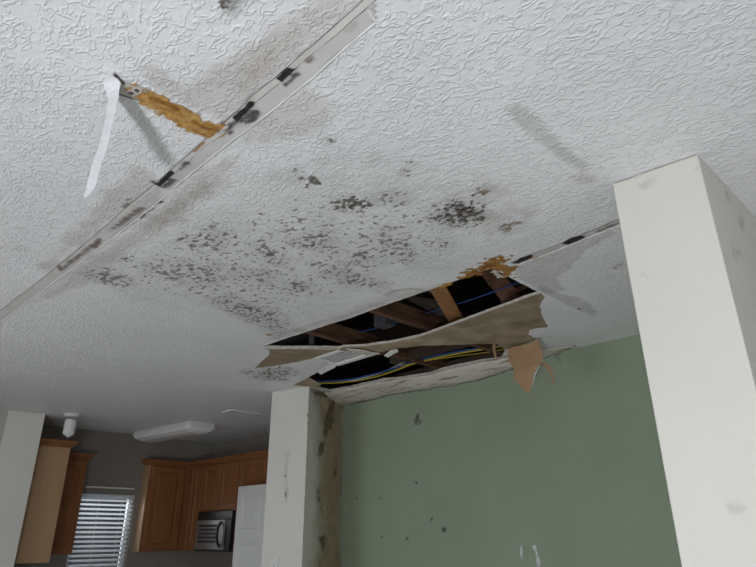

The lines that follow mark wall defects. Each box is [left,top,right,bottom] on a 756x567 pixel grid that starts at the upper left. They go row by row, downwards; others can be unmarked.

peeling [113,73,149,101]
damp [152,171,177,188]
mould [57,239,101,270]
mould [142,188,489,333]
mould [85,268,132,287]
peeling [256,348,338,368]
spalling [293,356,514,406]
damp [315,389,343,567]